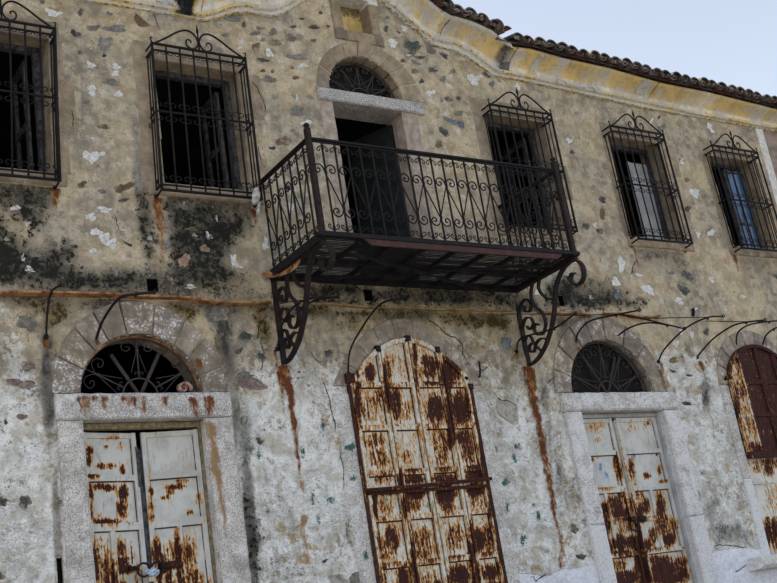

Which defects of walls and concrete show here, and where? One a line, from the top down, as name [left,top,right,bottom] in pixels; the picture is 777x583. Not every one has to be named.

flaking render [40,0,63,17]
flaking render [223,15,330,82]
leakage [0,187,250,292]
corrosion [153,197,165,262]
leakage [544,276,650,328]
corrosion [77,396,108,408]
corrosion [274,350,301,471]
corrosion [188,395,226,523]
corrosion [516,353,564,568]